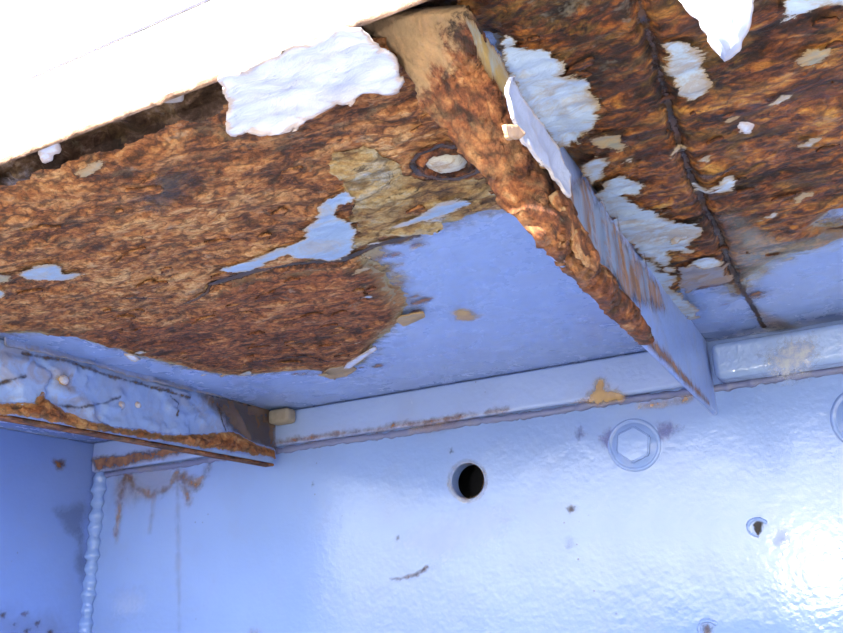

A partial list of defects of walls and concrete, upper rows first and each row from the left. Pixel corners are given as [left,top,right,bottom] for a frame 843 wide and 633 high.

peeling [780,0,843,23]
peeling [660,0,754,101]
peeling [737,122,754,134]
peeling [38,140,61,164]
peeling [464,16,724,320]
peeling [692,175,738,194]
corrosion [0,0,843,404]
peeling [322,366,357,380]
corrosion [0,392,318,494]
corrosion [171,471,203,501]